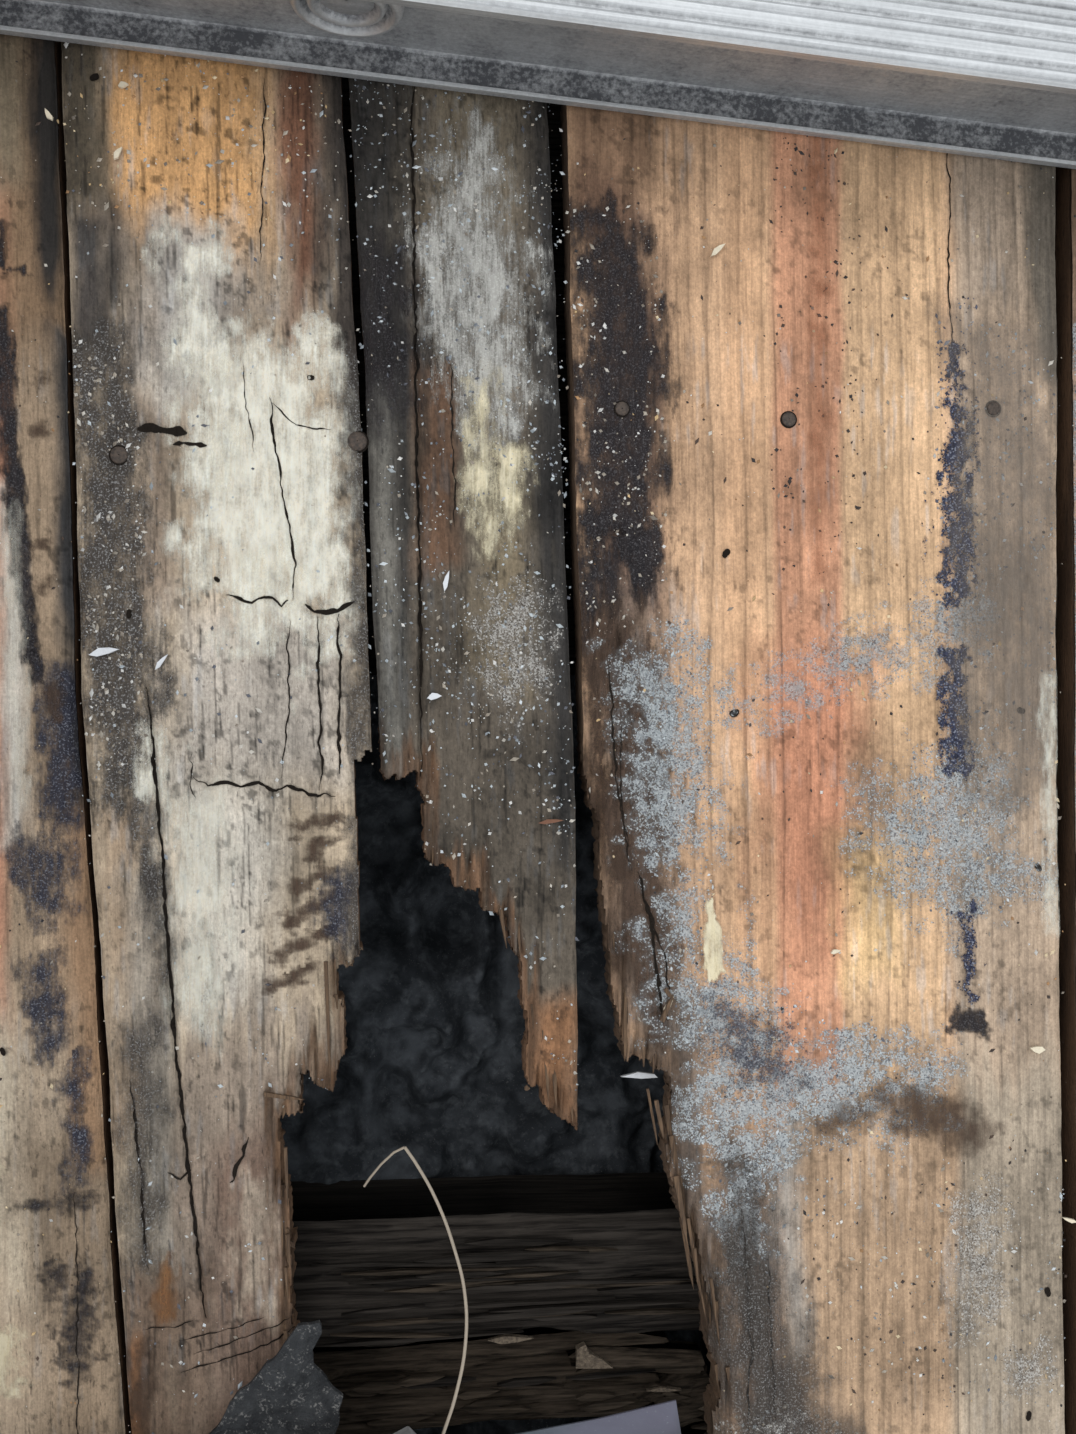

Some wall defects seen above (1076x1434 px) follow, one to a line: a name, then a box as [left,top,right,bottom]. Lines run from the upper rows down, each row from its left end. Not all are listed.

leakage [0,307,224,1022]
leakage [153,110,564,782]
leakage [569,190,692,1049]
leakage [922,331,1055,791]
leakage [15,949,92,1213]
crack [129,366,354,1373]
leakage [264,813,361,993]
leakage [696,983,813,1102]
leakage [823,1087,985,1148]
leakage [951,899,987,1007]
leakage [44,1261,103,1386]
leakage [706,1191,847,1434]